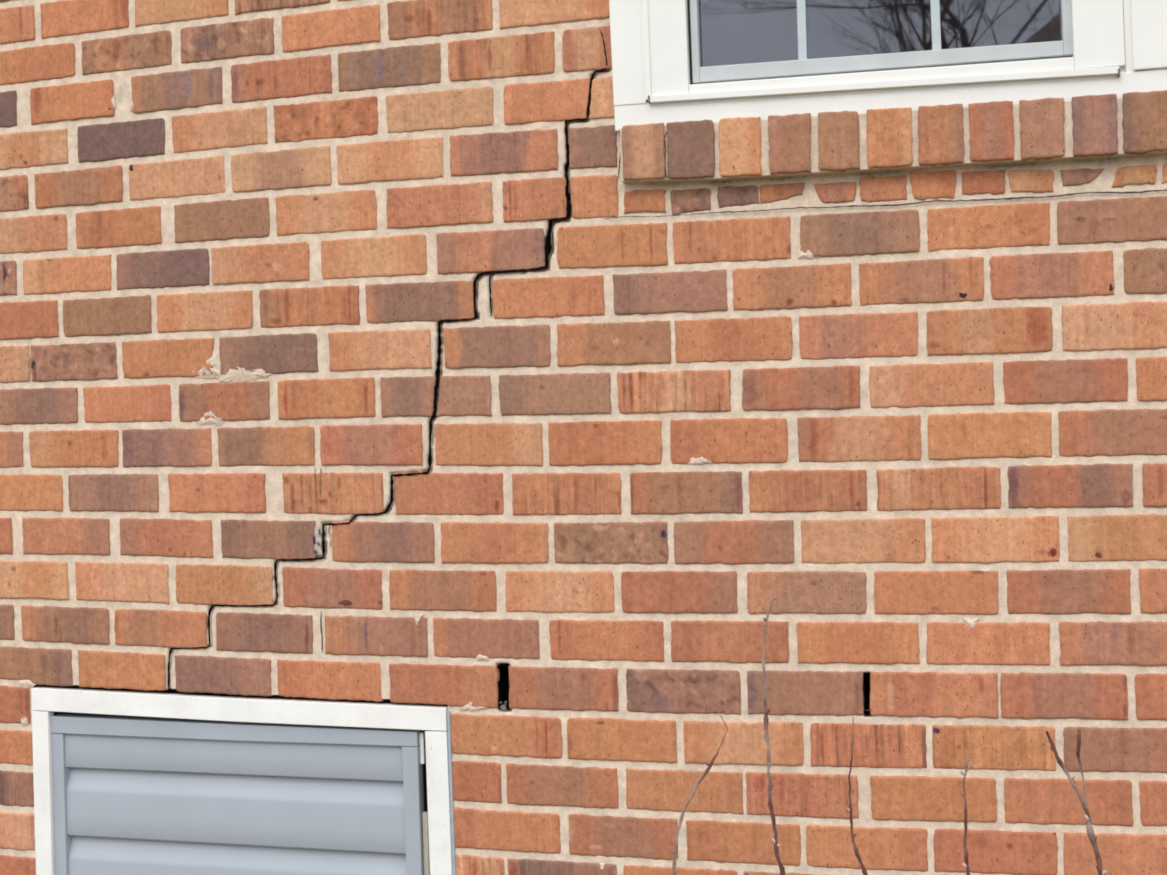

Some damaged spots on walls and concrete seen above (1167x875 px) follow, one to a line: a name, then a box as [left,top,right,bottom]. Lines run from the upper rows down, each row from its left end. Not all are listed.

crack [168,30,608,691]